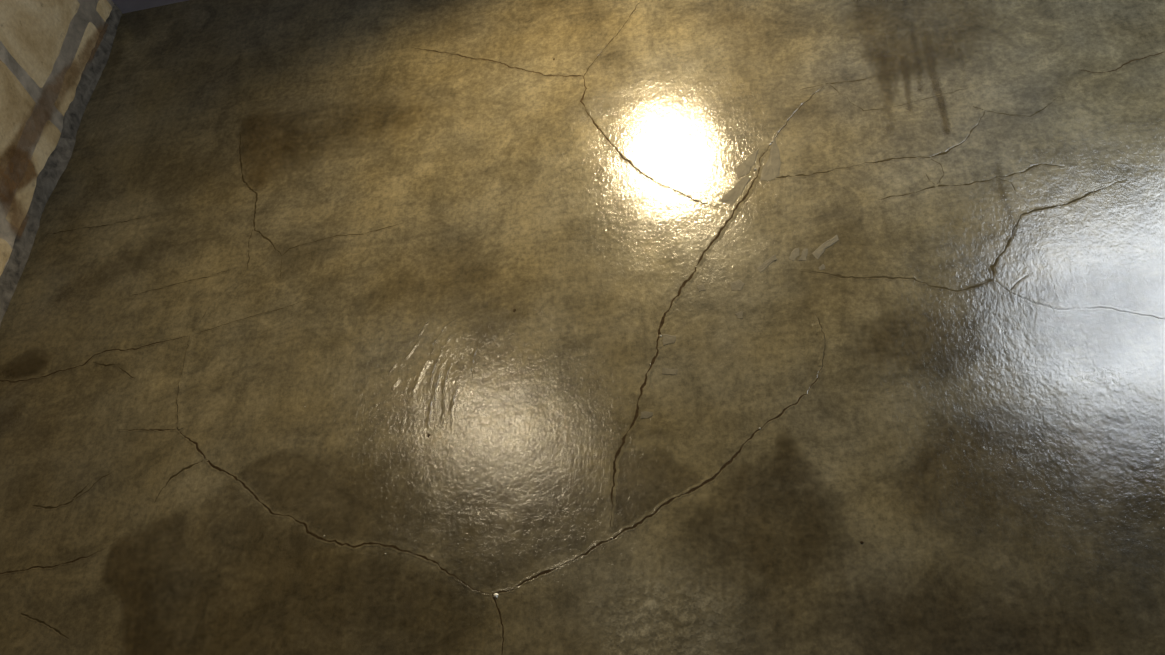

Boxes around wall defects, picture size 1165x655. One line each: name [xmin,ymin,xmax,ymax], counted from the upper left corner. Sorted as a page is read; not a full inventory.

water stain [860,0,977,134]
crack [775,96,1065,201]
crack [411,0,973,527]
crack [800,177,1165,320]
crack [0,131,827,655]
water stain [240,452,434,540]
water stain [908,422,1165,524]
water stain [593,580,733,655]